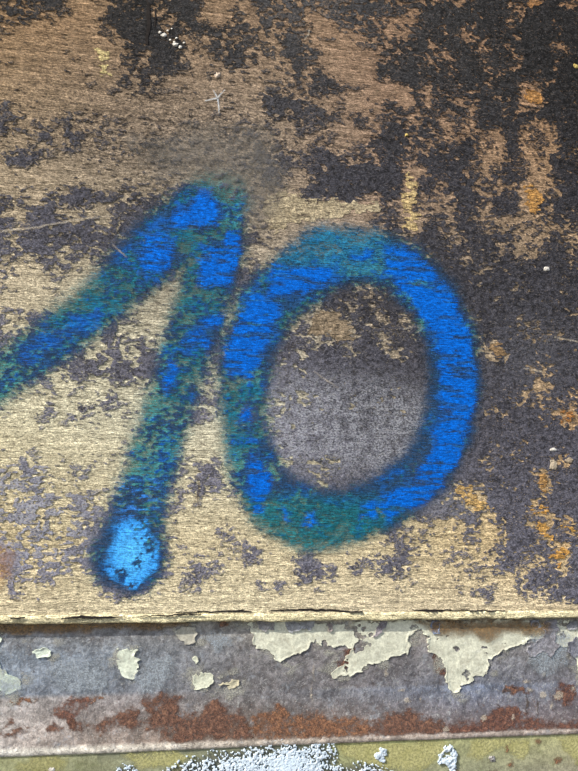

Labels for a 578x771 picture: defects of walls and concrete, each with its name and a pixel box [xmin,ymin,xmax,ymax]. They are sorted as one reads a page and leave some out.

peeling [169,622,205,646]
peeling [0,668,30,705]
peeling [32,640,61,661]
peeling [109,646,140,680]
peeling [184,656,244,700]
peeling [237,619,578,702]
corrosion [502,685,530,695]
corrosion [554,682,577,706]
corrosion [46,691,578,744]
efflorescence [163,739,391,771]
efflorescence [437,744,458,771]